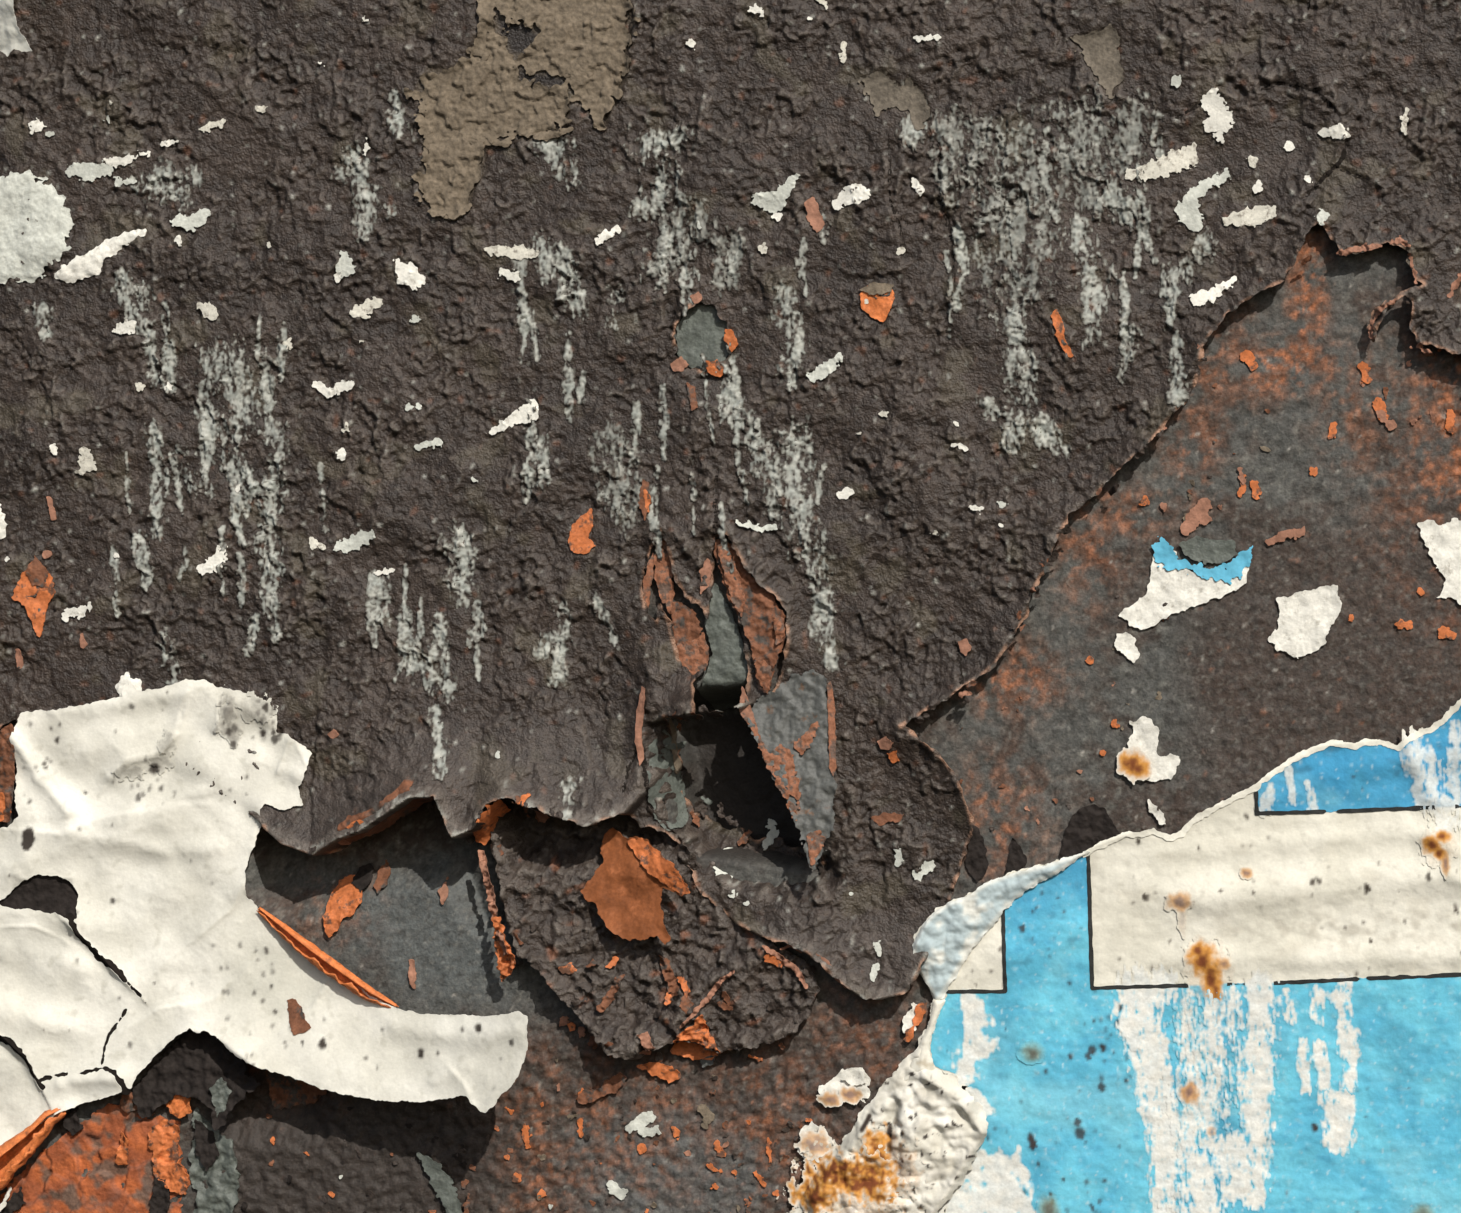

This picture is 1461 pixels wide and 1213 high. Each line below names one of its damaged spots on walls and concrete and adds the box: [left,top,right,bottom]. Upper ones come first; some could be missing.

water stain [508,117,755,424]
water stain [894,77,1219,460]
water stain [586,383,671,561]
water stain [700,342,849,675]
peeling [0,724,15,822]
peeling [257,859,399,1008]
water stain [364,518,489,781]
peeling [467,793,563,982]
peeling [558,828,763,1138]
peeling [634,536,838,873]
corrosion [1116,746,1152,785]
corrosion [776,1085,930,1213]